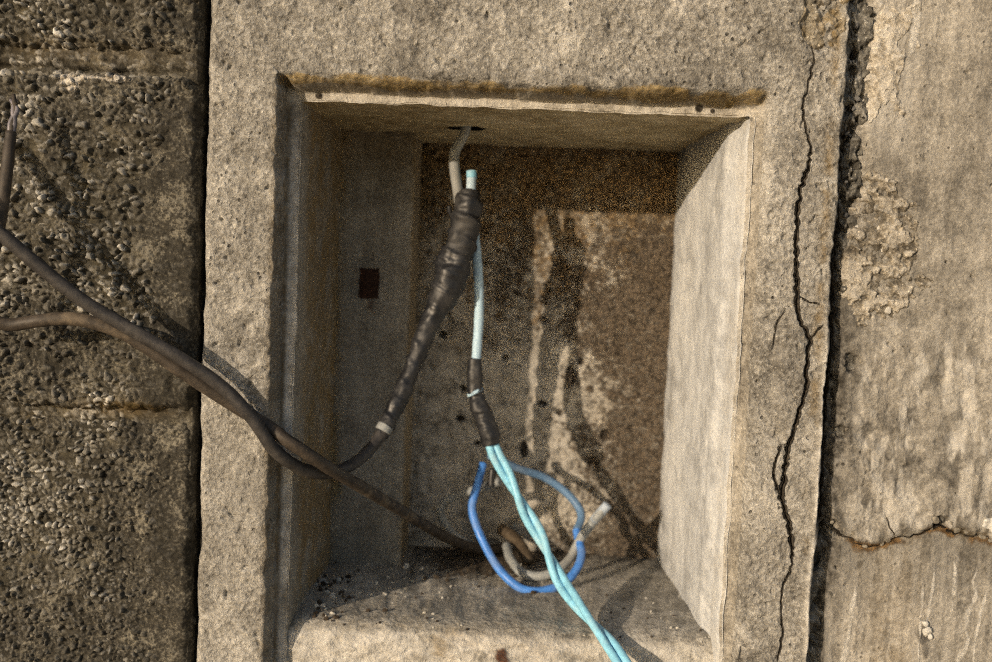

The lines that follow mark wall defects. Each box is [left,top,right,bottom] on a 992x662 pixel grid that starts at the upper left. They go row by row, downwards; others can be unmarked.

damp [419,142,678,558]
crack [772,46,822,661]
spalling [835,170,934,327]
crack [820,516,992,548]